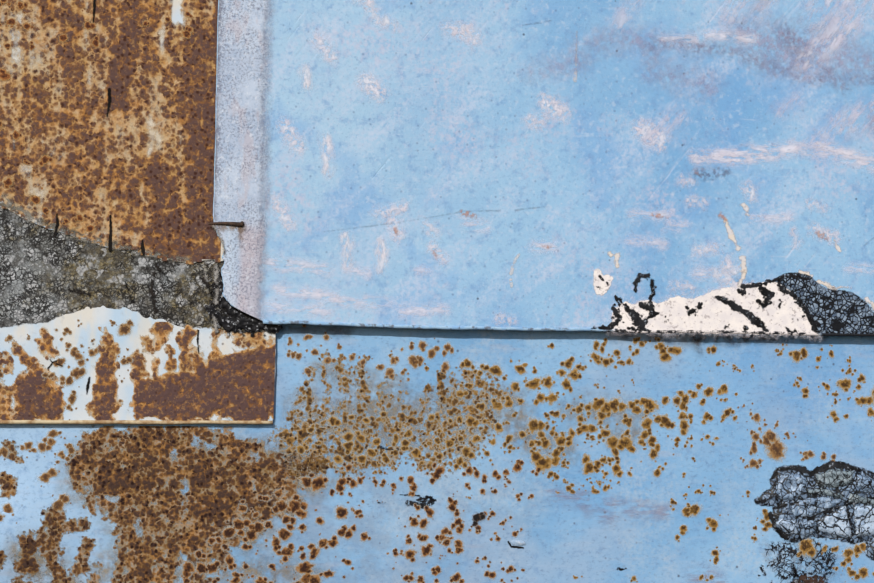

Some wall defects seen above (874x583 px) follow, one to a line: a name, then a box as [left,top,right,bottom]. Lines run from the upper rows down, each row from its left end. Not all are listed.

corrosion [0,0,242,264]
peeling [591,251,817,335]
peeling [798,270,848,290]
crack [773,272,874,334]
corrosion [775,343,834,369]
corrosion [793,356,874,423]
corrosion [0,319,796,583]
corrosion [800,440,836,462]
crack [758,539,836,583]
corrosion [794,539,874,582]